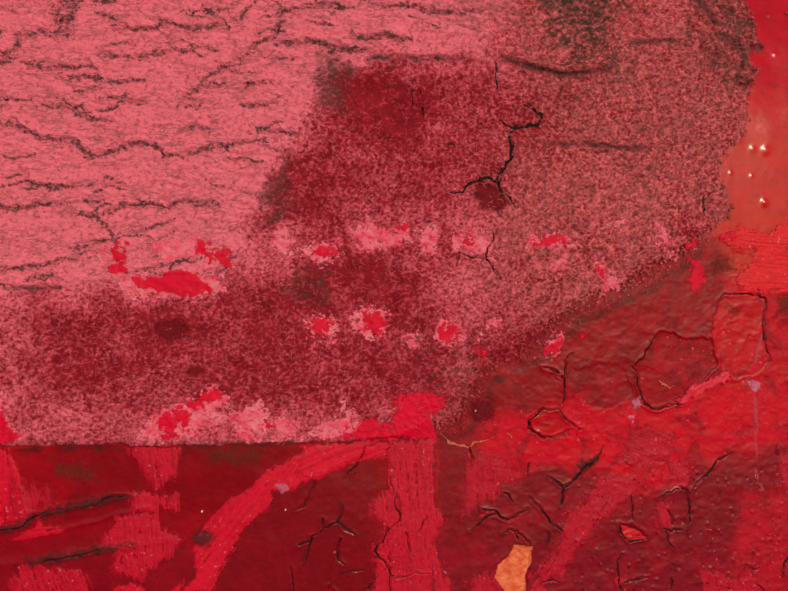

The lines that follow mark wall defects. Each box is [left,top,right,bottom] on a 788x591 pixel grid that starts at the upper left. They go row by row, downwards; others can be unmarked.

crack [449,104,543,208]
crack [458,228,505,284]
crack [527,352,581,438]
crack [631,332,685,410]
peeling [674,371,733,407]
crack [718,293,771,374]
crack [0,495,126,531]
crack [290,480,431,591]
peeling [495,545,533,591]
crack [470,447,603,547]
crack [617,452,733,590]